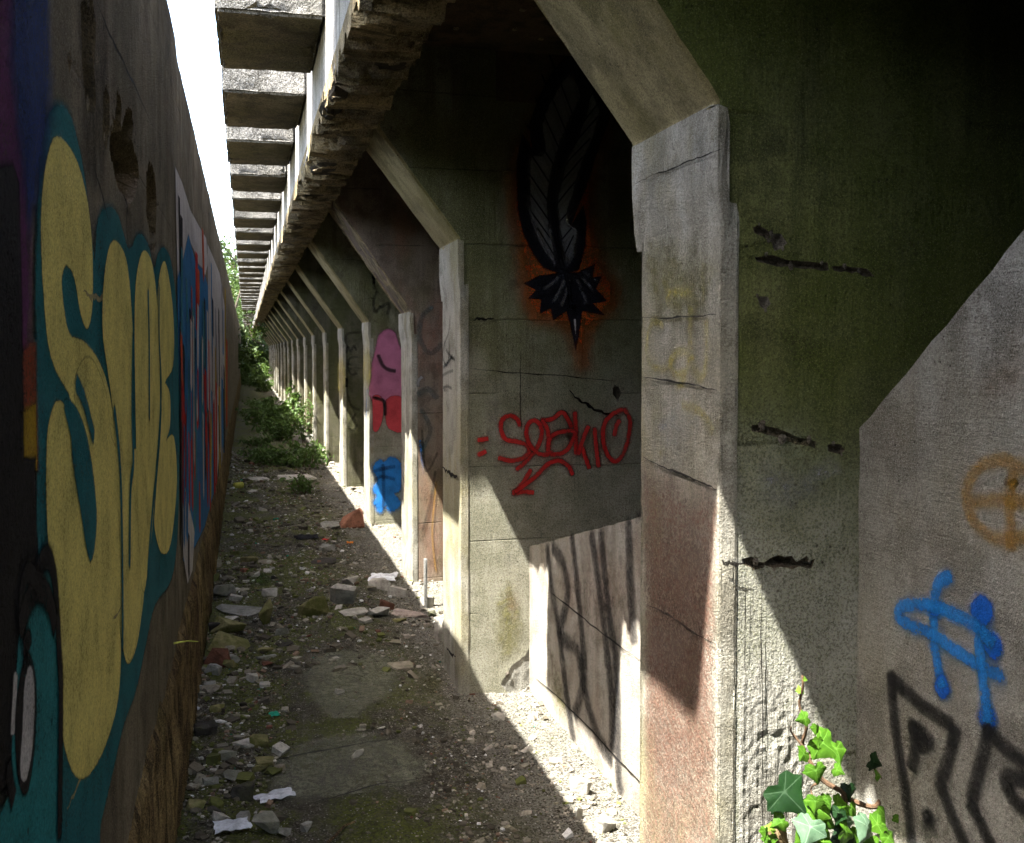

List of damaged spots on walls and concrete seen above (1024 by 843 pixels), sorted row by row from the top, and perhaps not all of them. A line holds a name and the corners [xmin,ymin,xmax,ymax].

spalling [319,82,352,120]
spalling [67,0,159,257]
spalling [309,162,337,179]
crack [636,149,720,184]
spalling [753,223,874,277]
crack [477,353,619,430]
spalling [752,420,845,456]
spalling [722,555,815,571]